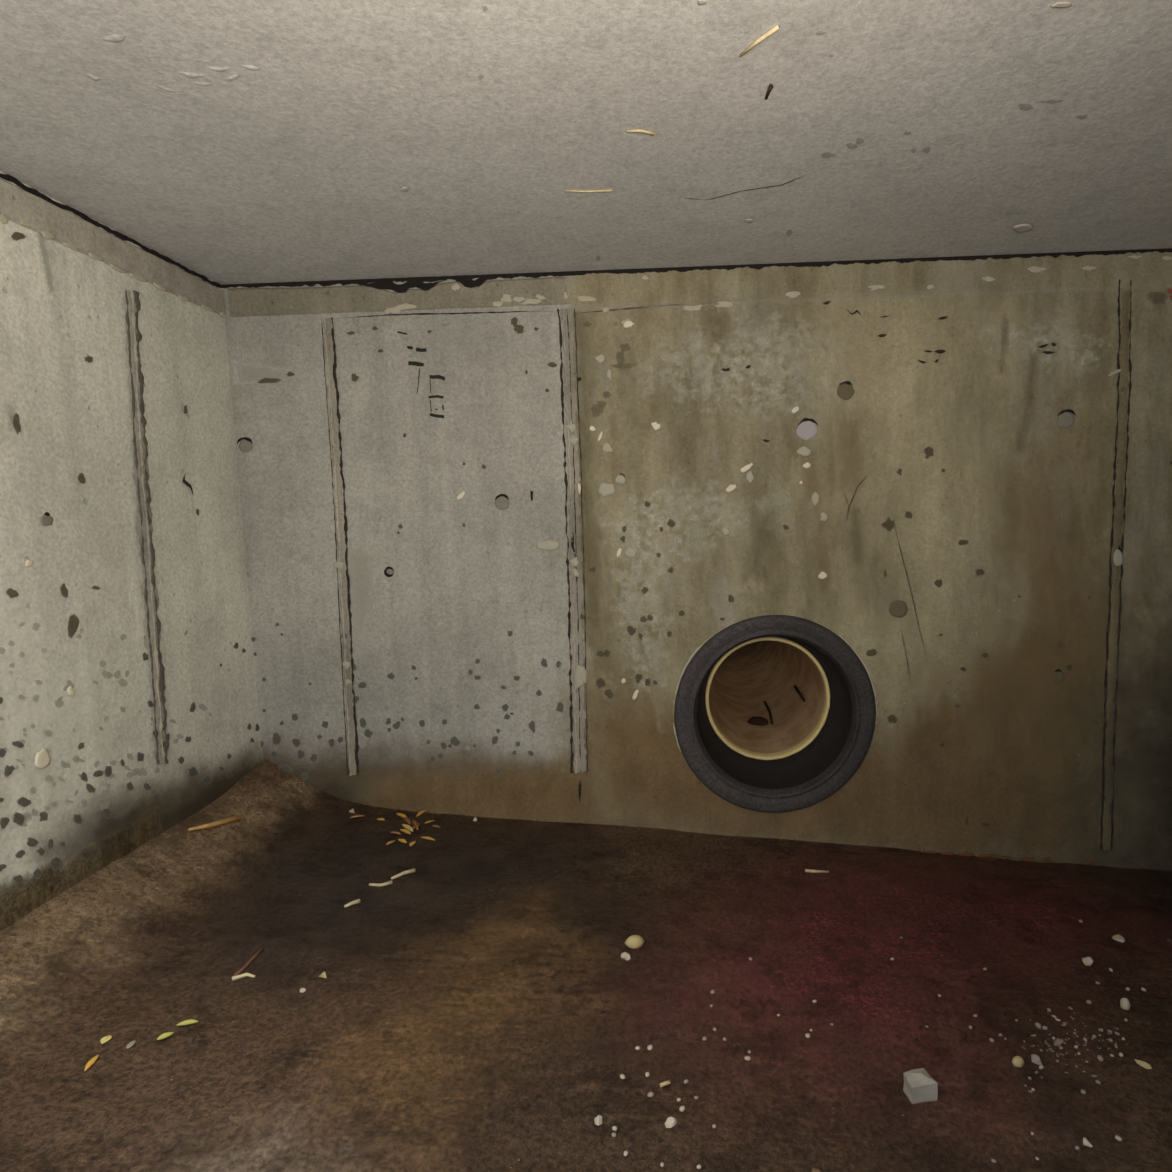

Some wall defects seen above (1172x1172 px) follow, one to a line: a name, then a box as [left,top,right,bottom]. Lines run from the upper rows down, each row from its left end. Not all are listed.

damp [663,296,1097,659]
damp [610,488,731,687]
damp [55,680,74,708]
damp [93,661,129,686]
damp [851,619,912,715]
damp [358,718,373,748]
damp [427,737,476,762]
damp [492,704,514,745]
damp [512,702,564,756]
damp [1100,634,1172,871]
damp [0,697,361,1030]